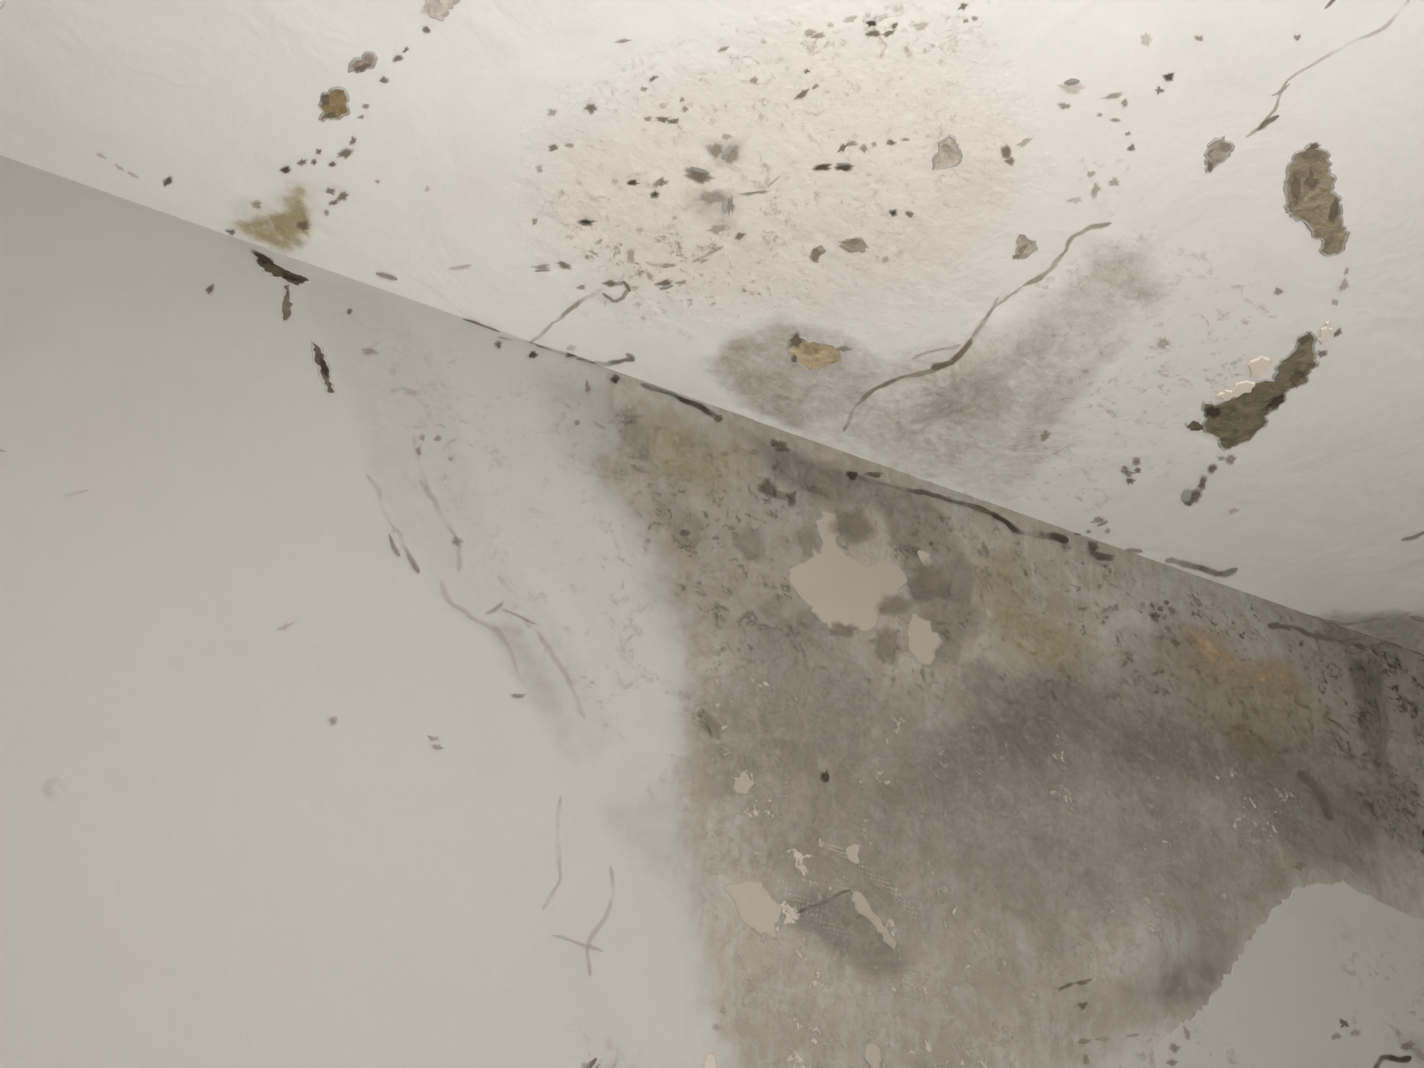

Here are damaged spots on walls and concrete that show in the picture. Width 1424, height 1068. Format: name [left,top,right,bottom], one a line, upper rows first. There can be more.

spalling [421,0,460,33]
spalling [318,47,408,122]
crack [1254,83,1290,133]
peeling [281,137,356,173]
peeling [325,188,348,215]
crack [1004,222,1112,301]
spalling [1283,142,1350,305]
crack [843,335,973,431]
spalling [1181,321,1341,506]
peeling [789,511,908,632]
leakage [510,0,1424,1068]
peeling [907,613,944,666]